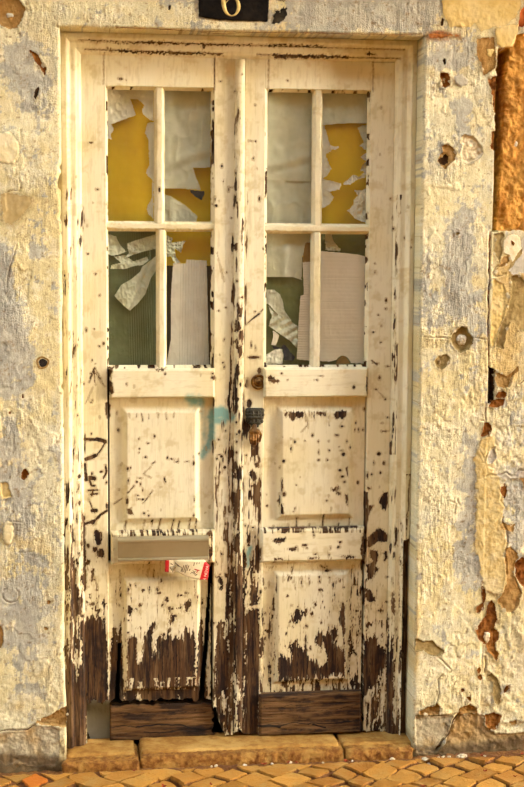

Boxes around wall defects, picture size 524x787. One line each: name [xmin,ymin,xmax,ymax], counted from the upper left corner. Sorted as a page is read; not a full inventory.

peeling [0,0,25,29]
spalling [29,50,48,75]
spalling [438,0,524,349]
crack [475,232,503,364]
peeling [486,366,519,408]
peeling [473,422,524,660]
peeling [413,637,444,656]
flaking render [414,666,524,752]